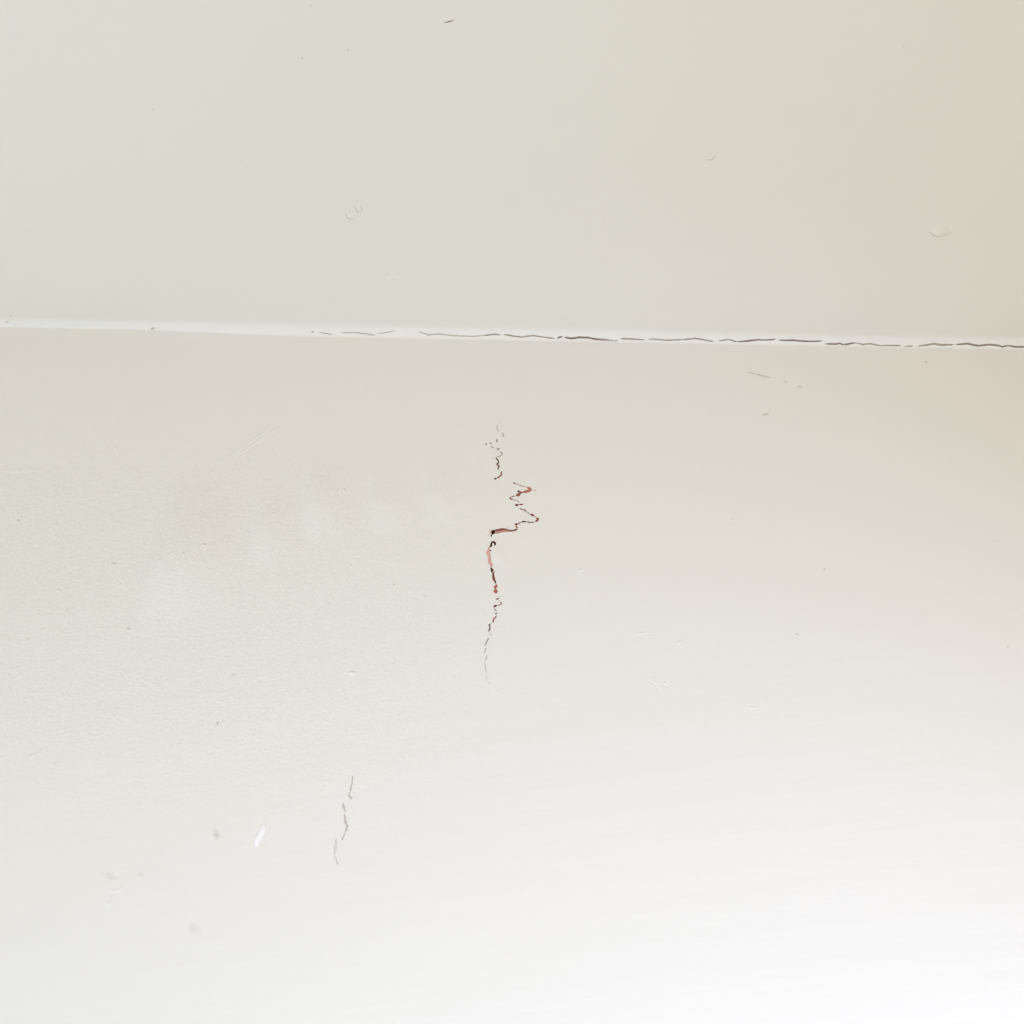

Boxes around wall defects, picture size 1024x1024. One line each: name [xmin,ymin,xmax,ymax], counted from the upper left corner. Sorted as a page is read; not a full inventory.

crack [311,329,393,337]
crack [419,331,1024,348]
crack [484,423,539,683]